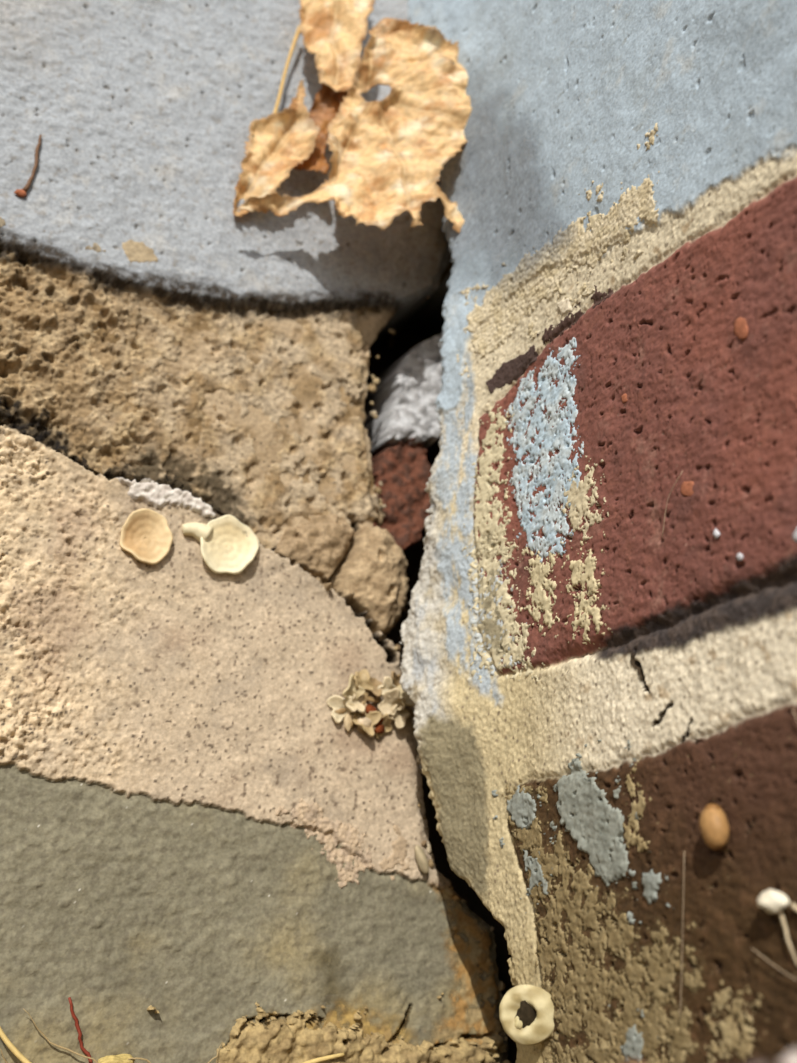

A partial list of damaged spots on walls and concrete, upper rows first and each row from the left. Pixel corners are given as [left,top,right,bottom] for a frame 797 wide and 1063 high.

peeling [637,123,658,151]
spalling [122,239,158,263]
crack [364,254,454,427]
crack [76,447,132,479]
spalling [0,252,443,552]
peeling [457,171,660,690]
crack [354,612,401,663]
crack [630,653,693,743]
crack [418,803,452,888]
peeling [492,740,766,1063]
crack [245,1013,324,1023]
crack [393,1004,411,1038]